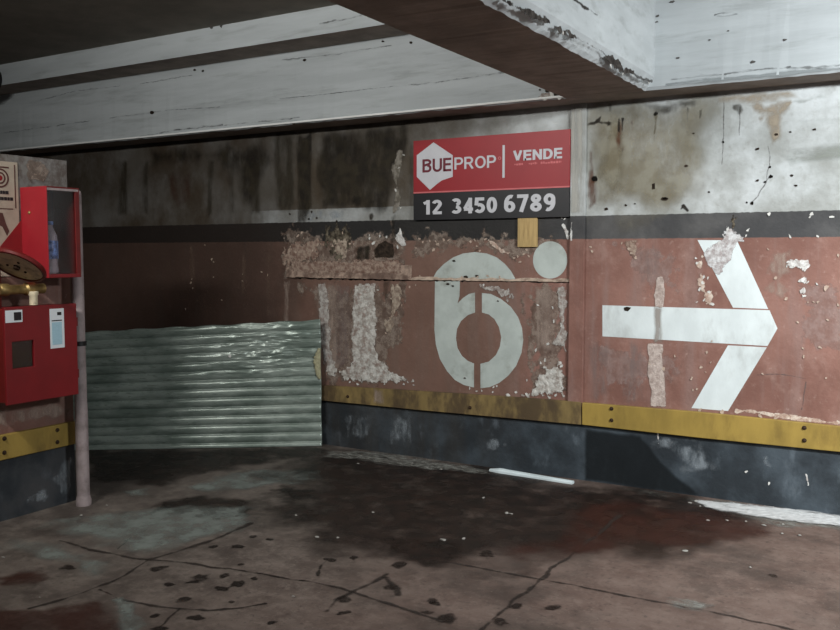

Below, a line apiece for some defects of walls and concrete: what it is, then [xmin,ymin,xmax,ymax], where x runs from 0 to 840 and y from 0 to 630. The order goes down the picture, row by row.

spalling [503,0,578,42]
damp [276,125,406,221]
peeling [281,108,582,284]
damp [589,103,703,206]
damp [726,93,791,140]
peeling [695,215,750,306]
peeling [297,277,354,386]
peeling [374,281,416,362]
peeling [464,275,568,399]
peeling [648,276,666,407]
crack [28,523,444,627]
crack [430,515,794,630]